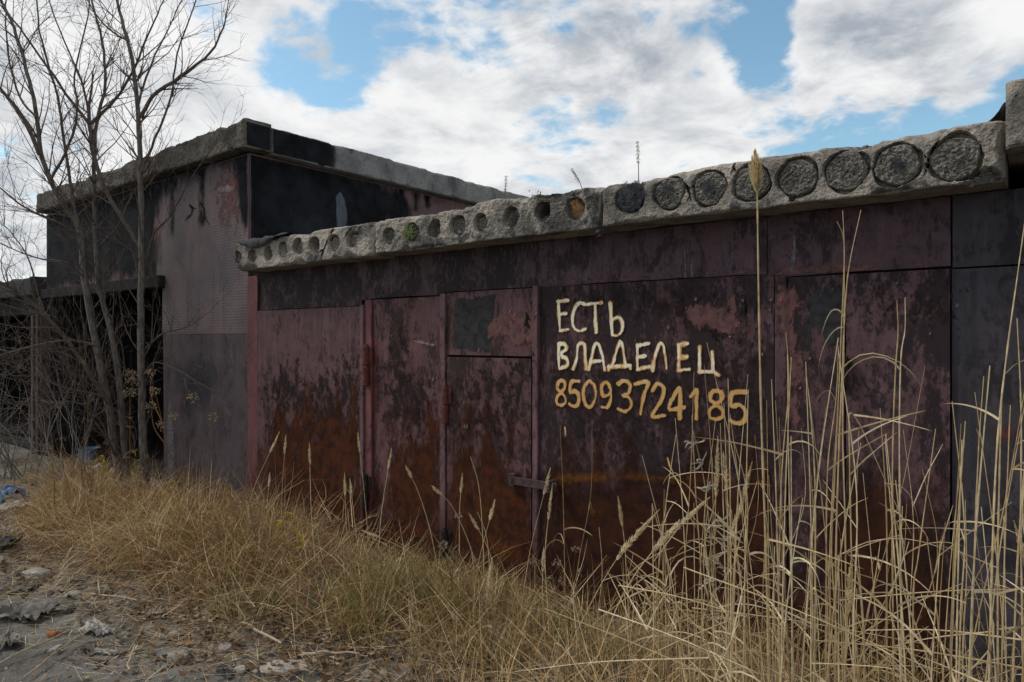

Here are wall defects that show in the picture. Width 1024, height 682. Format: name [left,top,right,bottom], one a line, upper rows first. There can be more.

corrosion [258,370,439,553]
corrosion [452,404,531,588]
corrosion [543,433,772,657]
peeling [451,260,882,483]